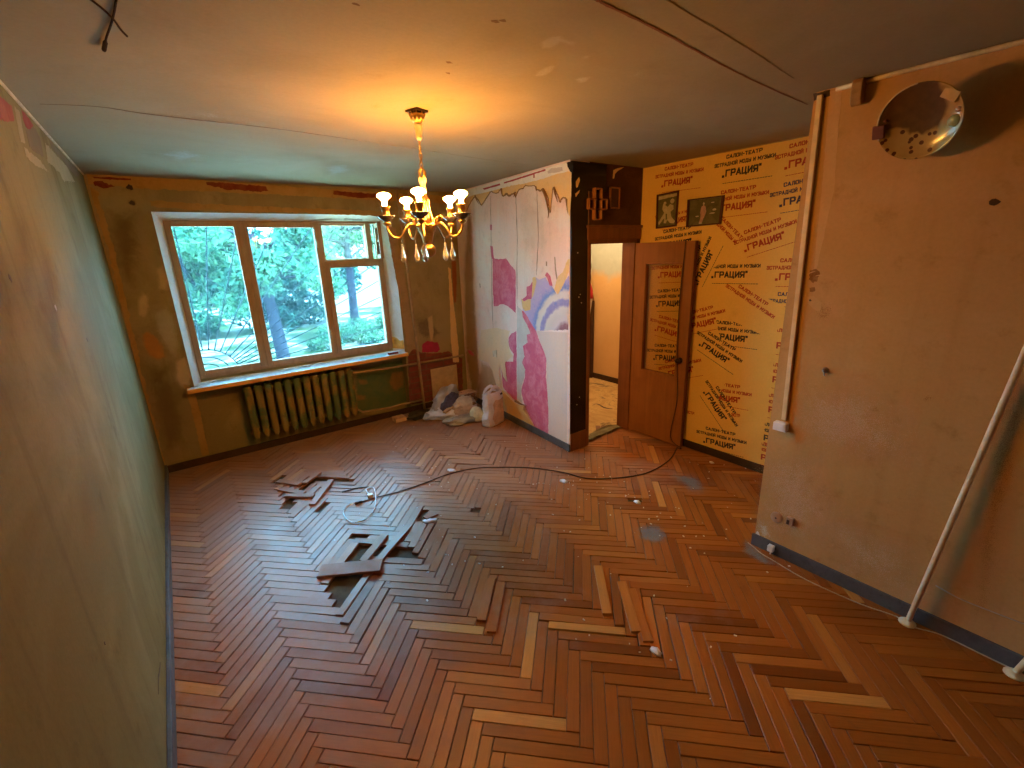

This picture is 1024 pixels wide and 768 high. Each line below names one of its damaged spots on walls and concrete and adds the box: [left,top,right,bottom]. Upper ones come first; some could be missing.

crack [594,0,808,105]
flaking render [517,306,530,402]